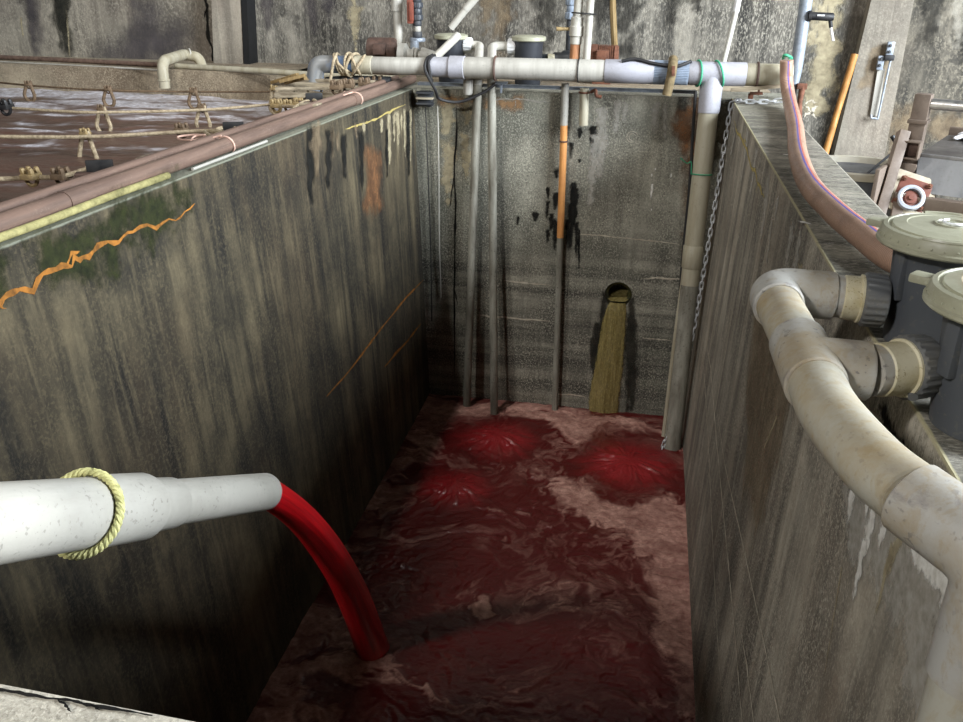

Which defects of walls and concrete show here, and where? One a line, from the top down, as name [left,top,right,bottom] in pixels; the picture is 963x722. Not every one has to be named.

water stain [20,0,40,43]
water stain [53,0,73,56]
crack [204,0,213,61]
water stain [923,0,943,41]
water stain [532,100,676,266]
crack [0,203,195,309]